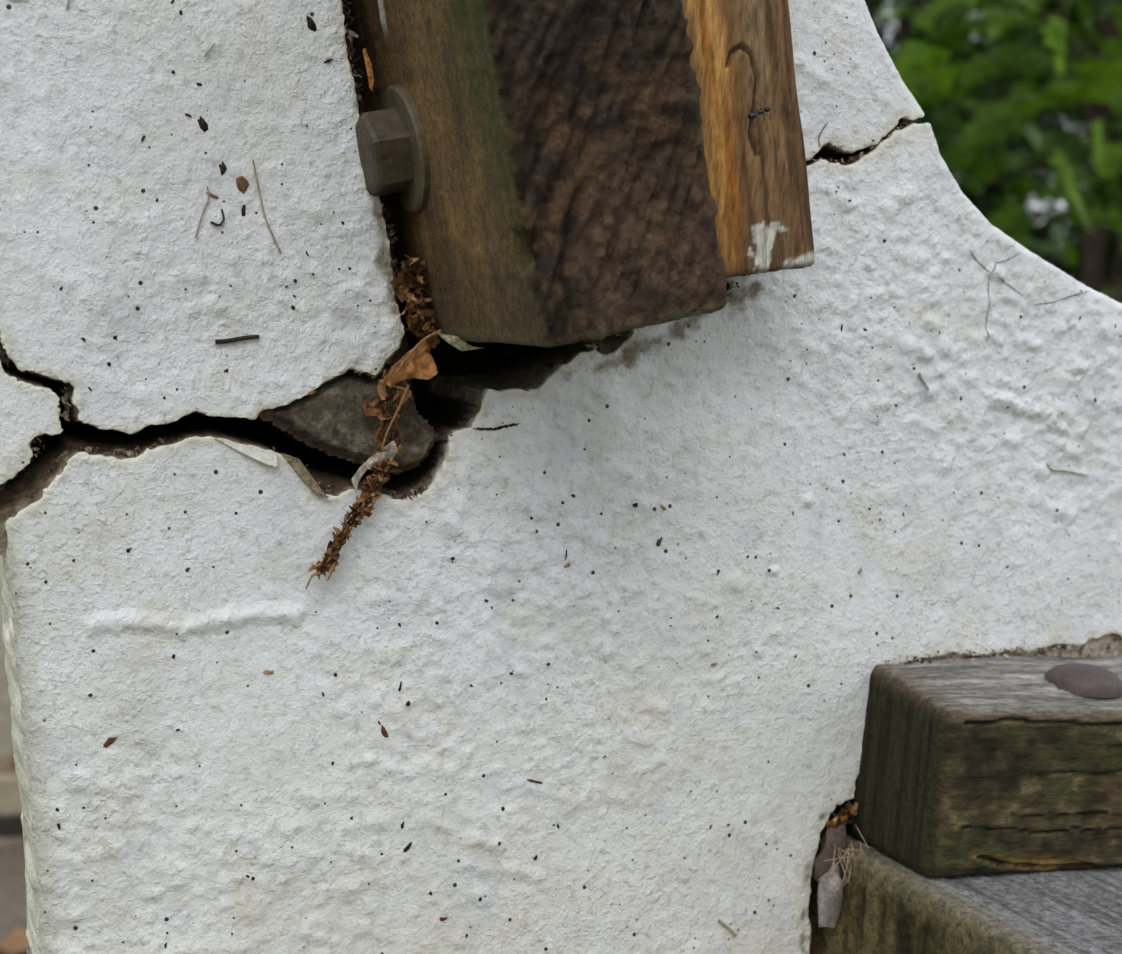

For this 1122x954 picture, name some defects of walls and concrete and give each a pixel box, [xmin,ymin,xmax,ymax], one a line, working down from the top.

crack [806,118,921,166]
crack [0,338,520,555]
spalling [904,633,1122,663]